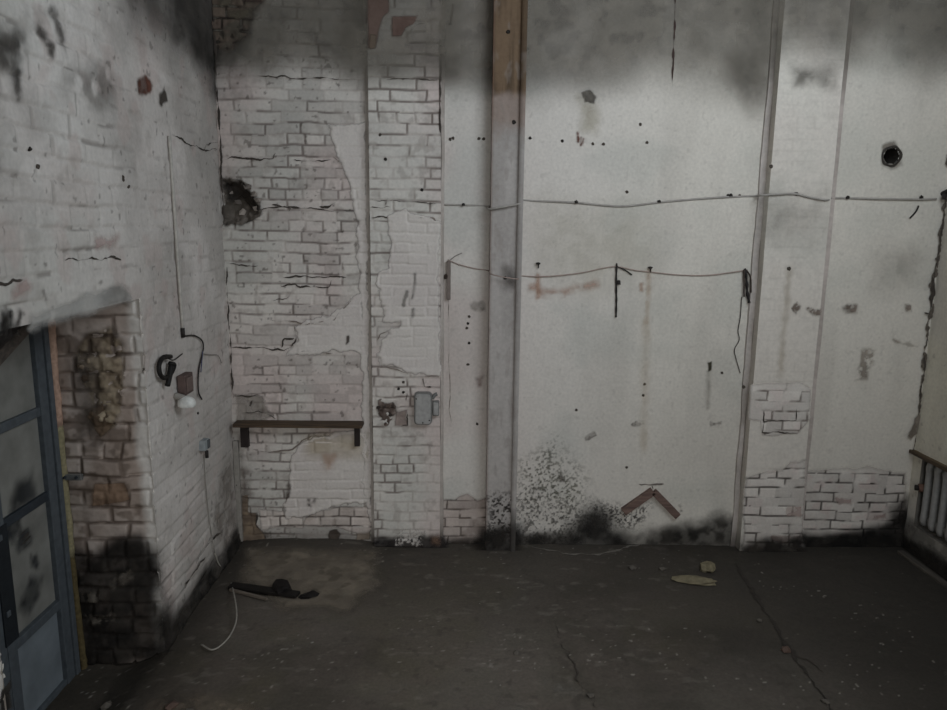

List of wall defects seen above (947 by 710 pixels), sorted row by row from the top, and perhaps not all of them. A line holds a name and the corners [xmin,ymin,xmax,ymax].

peeling [212,0,264,49]
peeling [368,0,417,49]
spalling [222,178,263,226]
crack [0,278,22,286]
spalling [76,328,124,437]
flaking render [376,399,408,427]
flaking render [749,383,810,436]
mould [526,451,578,531]
flaking render [742,461,905,548]
flaking render [185,465,372,599]